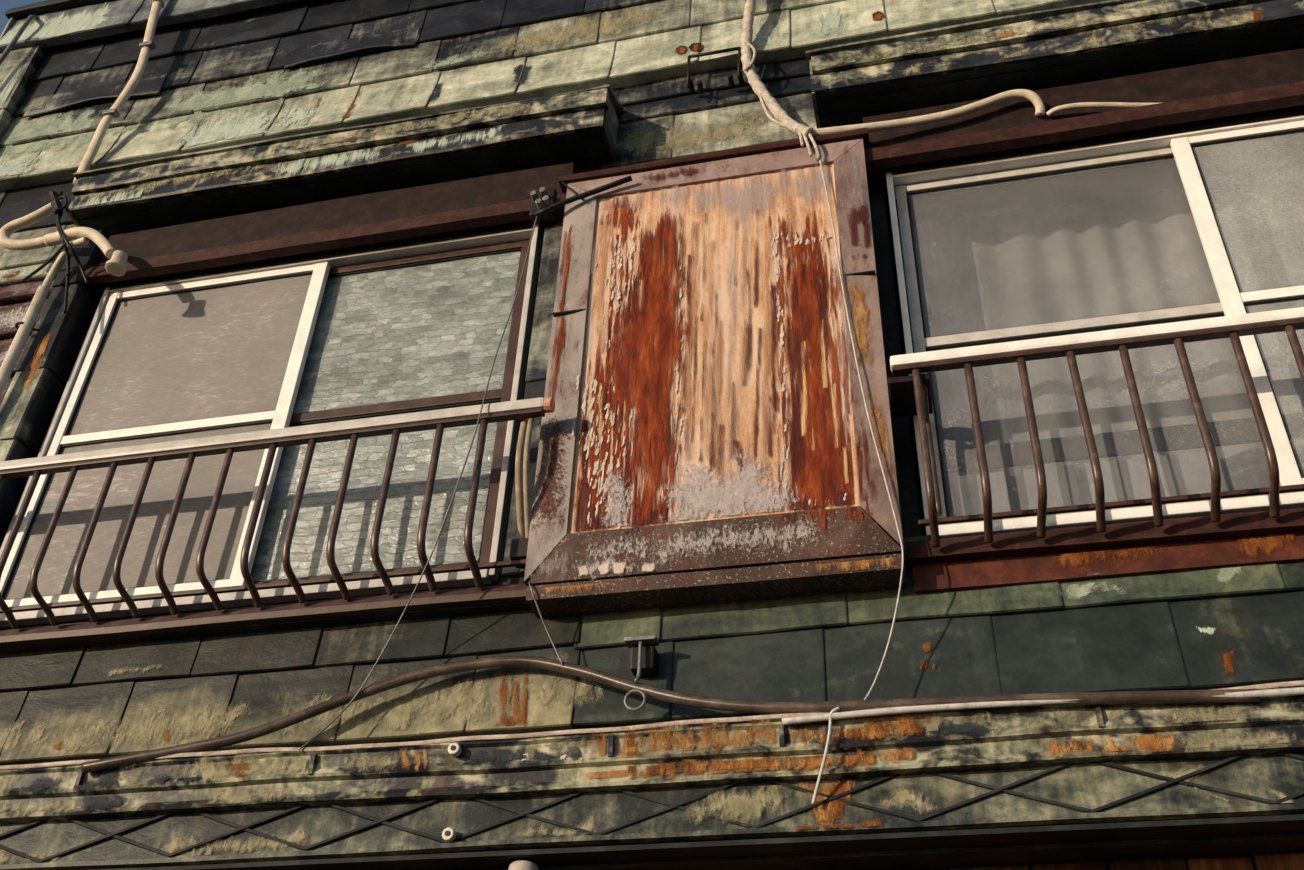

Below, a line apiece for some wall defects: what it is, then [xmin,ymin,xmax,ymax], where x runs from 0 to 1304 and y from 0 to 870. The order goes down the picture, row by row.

damp [0,3,115,45]
damp [0,65,324,177]
damp [246,104,533,175]
damp [69,169,230,208]
rust [531,196,889,536]
peeling [572,230,846,579]
rust [1059,546,1155,566]
rust [1240,533,1294,556]
damp [686,785,783,823]
rust [588,712,933,830]
rust [1047,734,1174,757]
damp [1164,704,1289,801]